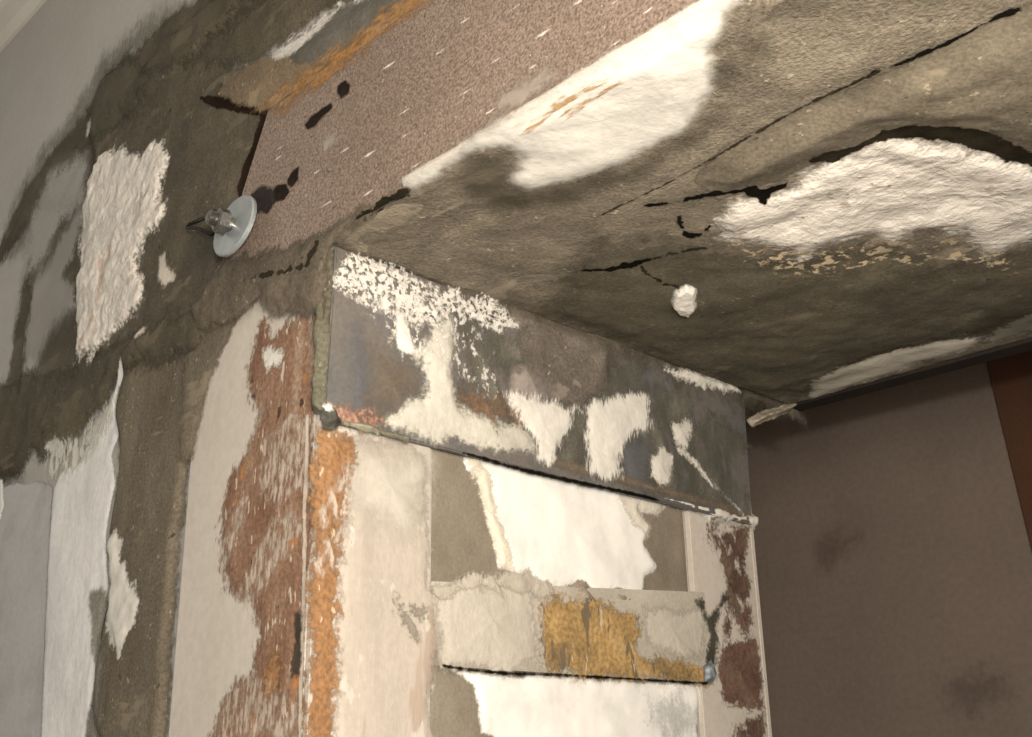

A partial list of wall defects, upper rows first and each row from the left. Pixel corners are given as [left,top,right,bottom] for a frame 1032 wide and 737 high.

corrosion [255,0,431,112]
peeling [26,139,170,363]
peeling [158,252,176,286]
crack [581,8,1032,289]
flaking render [713,138,1032,277]
corrosion [209,314,385,737]
peeling [465,457,514,570]
peeling [619,494,667,540]
corrosion [538,517,767,737]